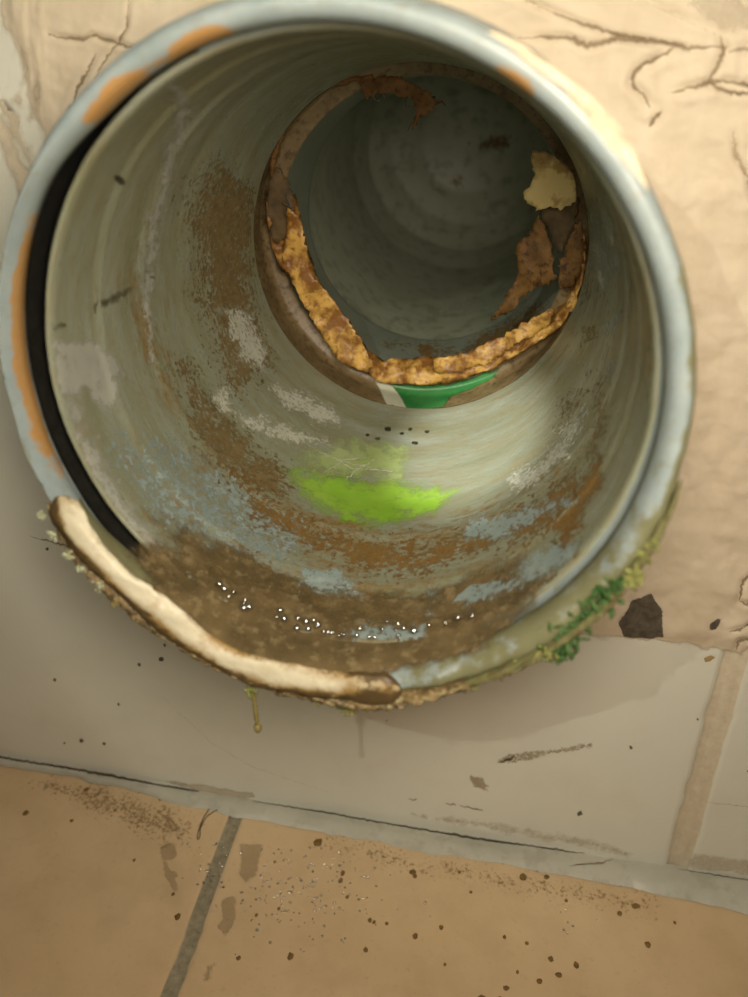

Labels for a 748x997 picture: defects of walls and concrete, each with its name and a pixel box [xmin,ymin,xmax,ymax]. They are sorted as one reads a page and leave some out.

crack [49,0,131,106]
crack [518,1,748,127]
crack [732,131,748,178]
corrosion [384,298,549,357]
corrosion [218,455,608,583]